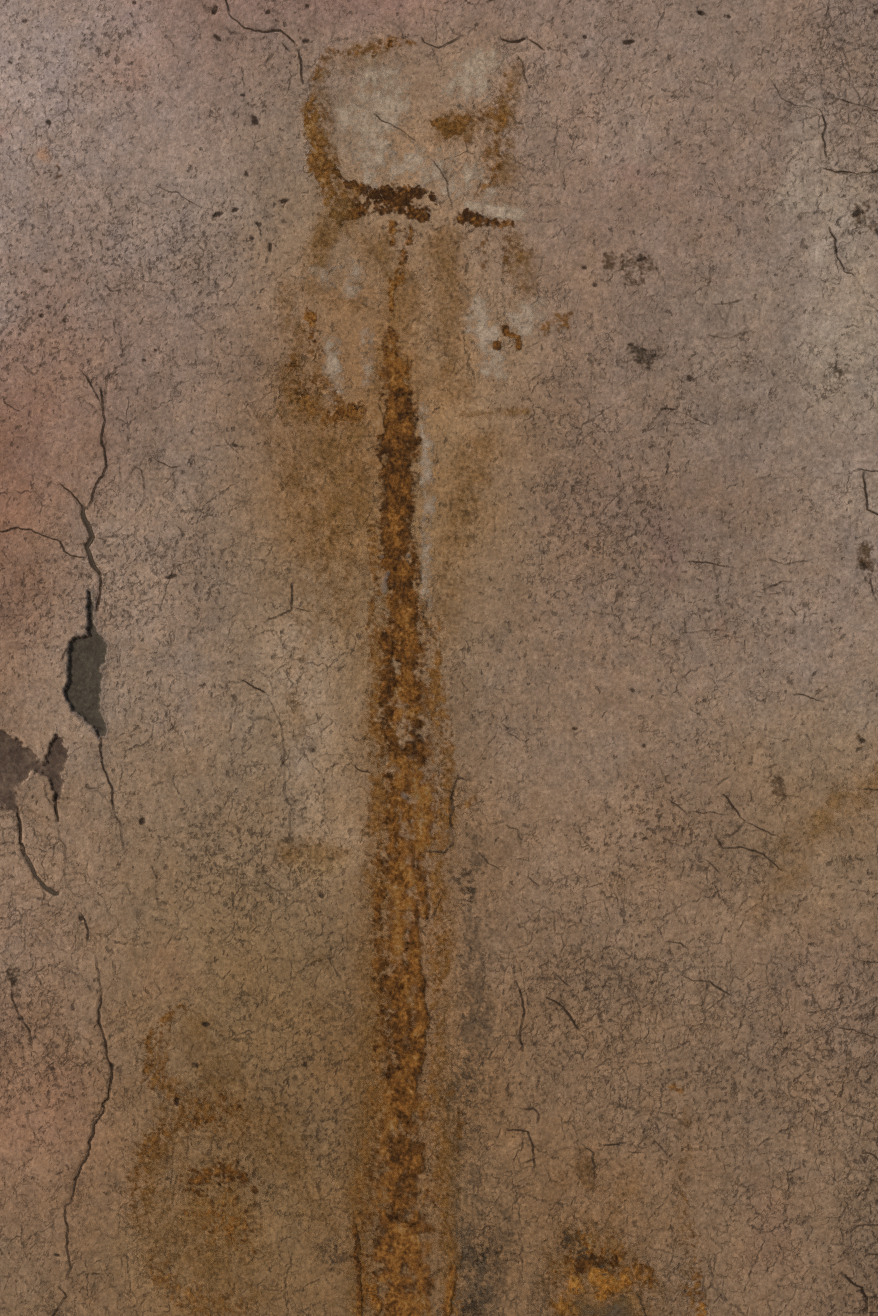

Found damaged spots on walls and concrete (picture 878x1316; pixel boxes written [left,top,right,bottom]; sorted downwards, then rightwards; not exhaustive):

crack [225,0,302,82]
corrosion [430,73,512,194]
corrosion [456,208,514,273]
corrosion [492,324,521,350]
crack [0,364,177,611]
crack [855,468,878,515]
spalling [64,591,108,738]
corrosion [304,96,476,1316]
spalling [0,730,68,812]
crack [99,735,123,848]
crack [16,783,113,1316]
corrosion [537,1230,658,1316]